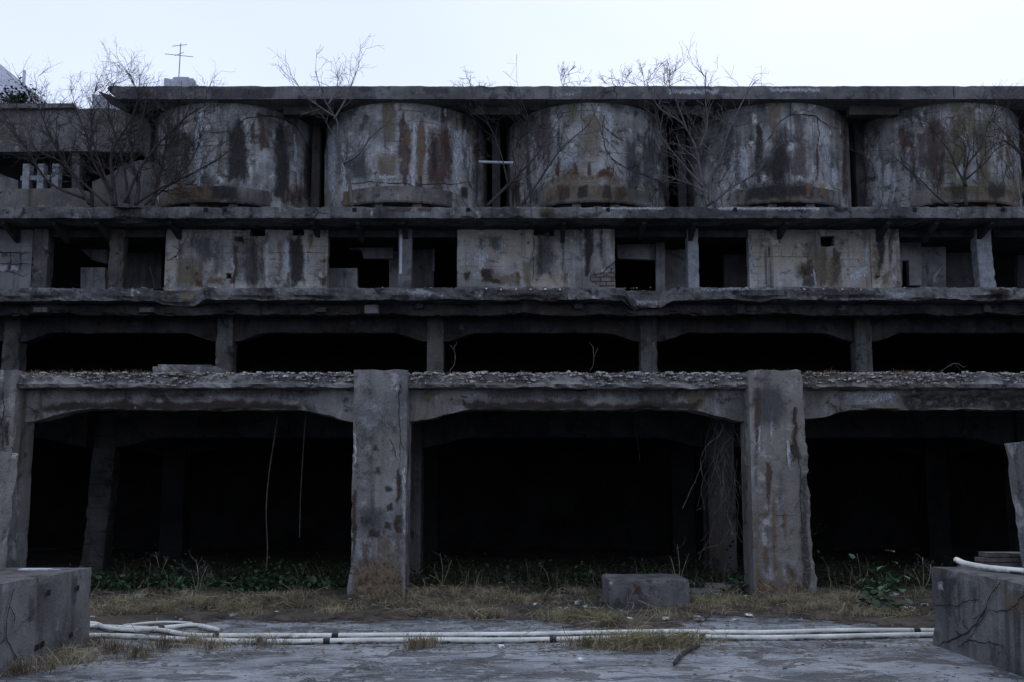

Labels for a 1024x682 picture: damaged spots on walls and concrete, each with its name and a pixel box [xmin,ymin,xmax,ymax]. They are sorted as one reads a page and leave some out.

corrosion [398,108,466,188]
damp [695,87,819,217]
damp [241,233,307,287]
damp [495,229,603,287]
corrosion [753,387,807,595]
crack [0,589,40,660]
crack [931,576,1024,649]